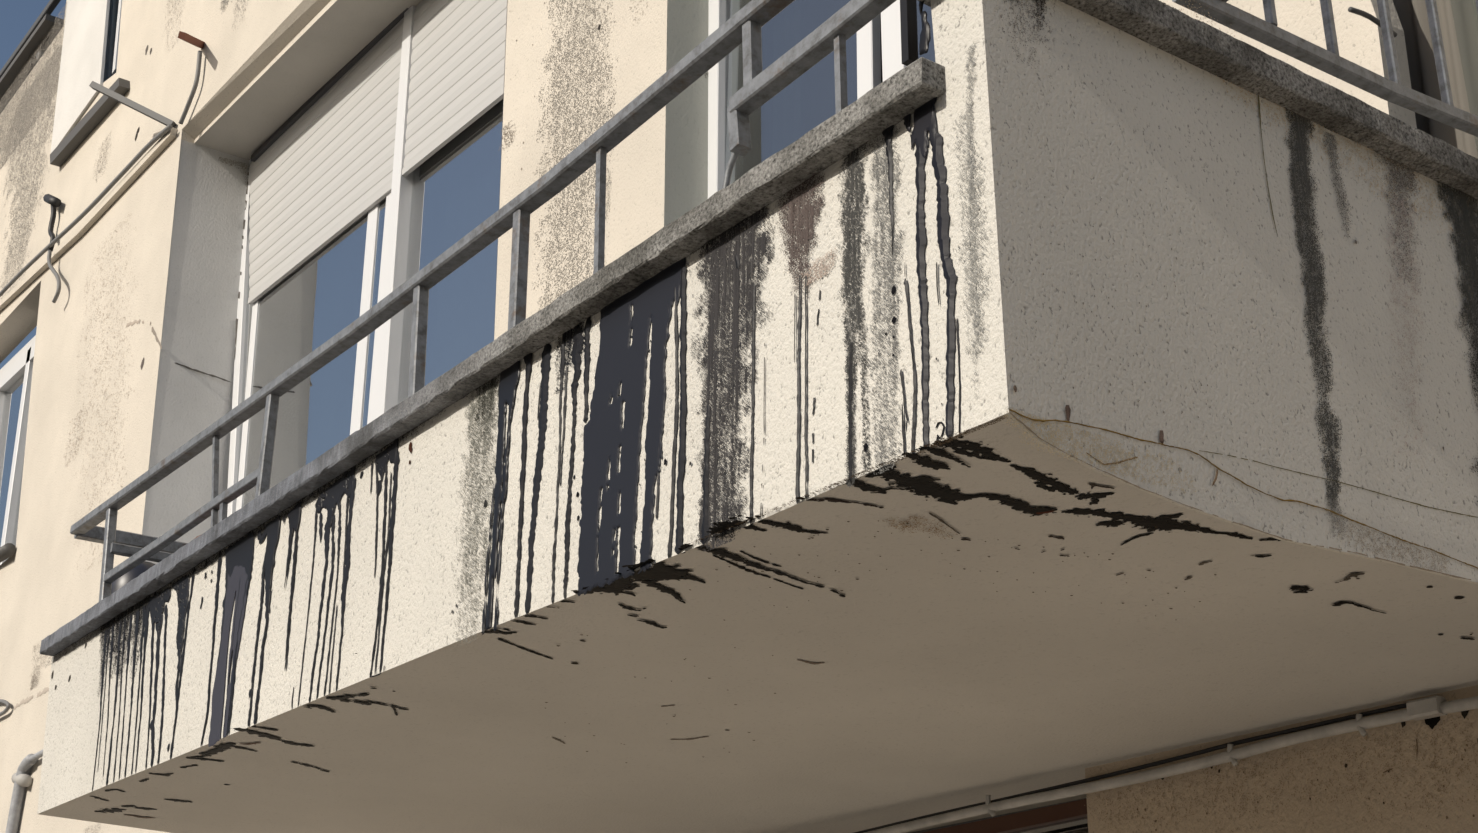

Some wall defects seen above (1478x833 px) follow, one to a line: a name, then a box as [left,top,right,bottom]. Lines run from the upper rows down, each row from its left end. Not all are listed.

water stain [535,0,648,176]
crack [126,172,249,382]
water stain [533,149,614,311]
water stain [777,122,904,488]
water stain [1216,75,1478,575]
water stain [452,376,500,643]
crack [1009,409,1478,569]